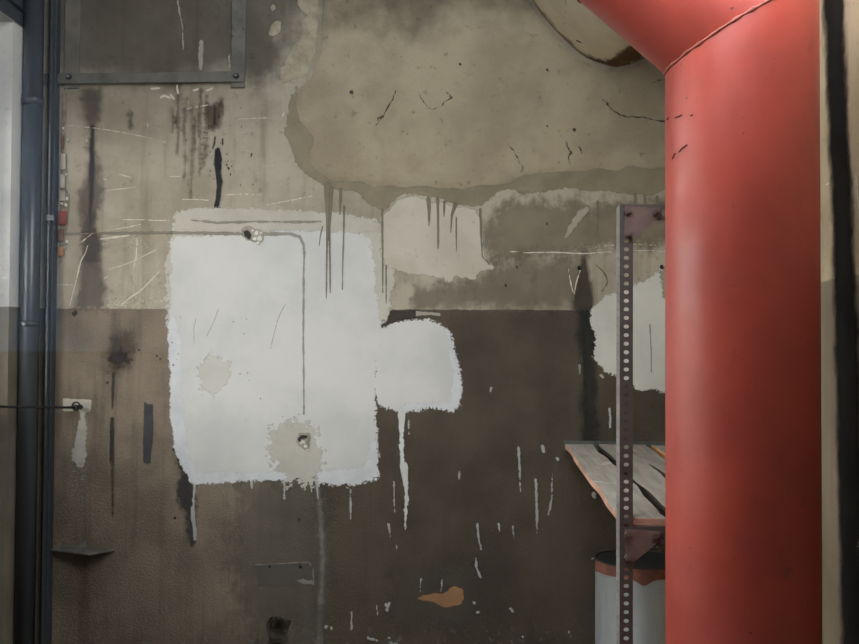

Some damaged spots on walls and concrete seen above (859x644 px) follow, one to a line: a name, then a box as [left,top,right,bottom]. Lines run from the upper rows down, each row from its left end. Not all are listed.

crack [602,99,665,123]
flaking render [242,226,264,245]
leakage [319,182,345,298]
leakage [426,197,457,252]
flaking render [297,433,311,451]